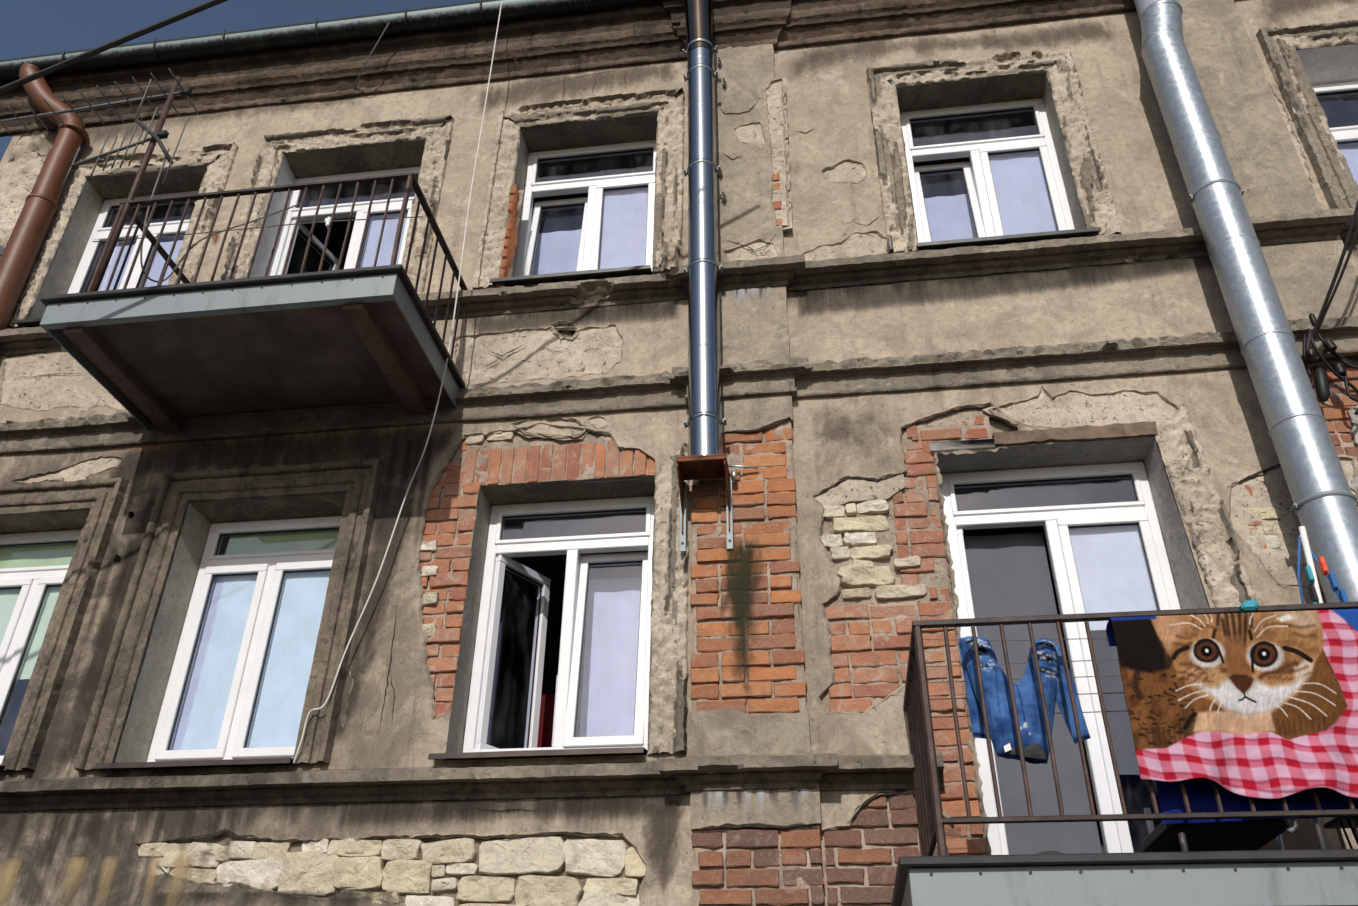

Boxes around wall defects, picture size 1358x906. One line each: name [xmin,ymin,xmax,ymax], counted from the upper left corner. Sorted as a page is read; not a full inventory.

peeling [722,77,793,262]
peeling [451,320,624,387]
peeling [11,455,123,484]
flaking render [415,414,656,721]
spalling [1226,463,1327,603]
flaking render [1304,360,1358,508]
flaking render [690,385,1179,906]
spalling [134,828,650,906]